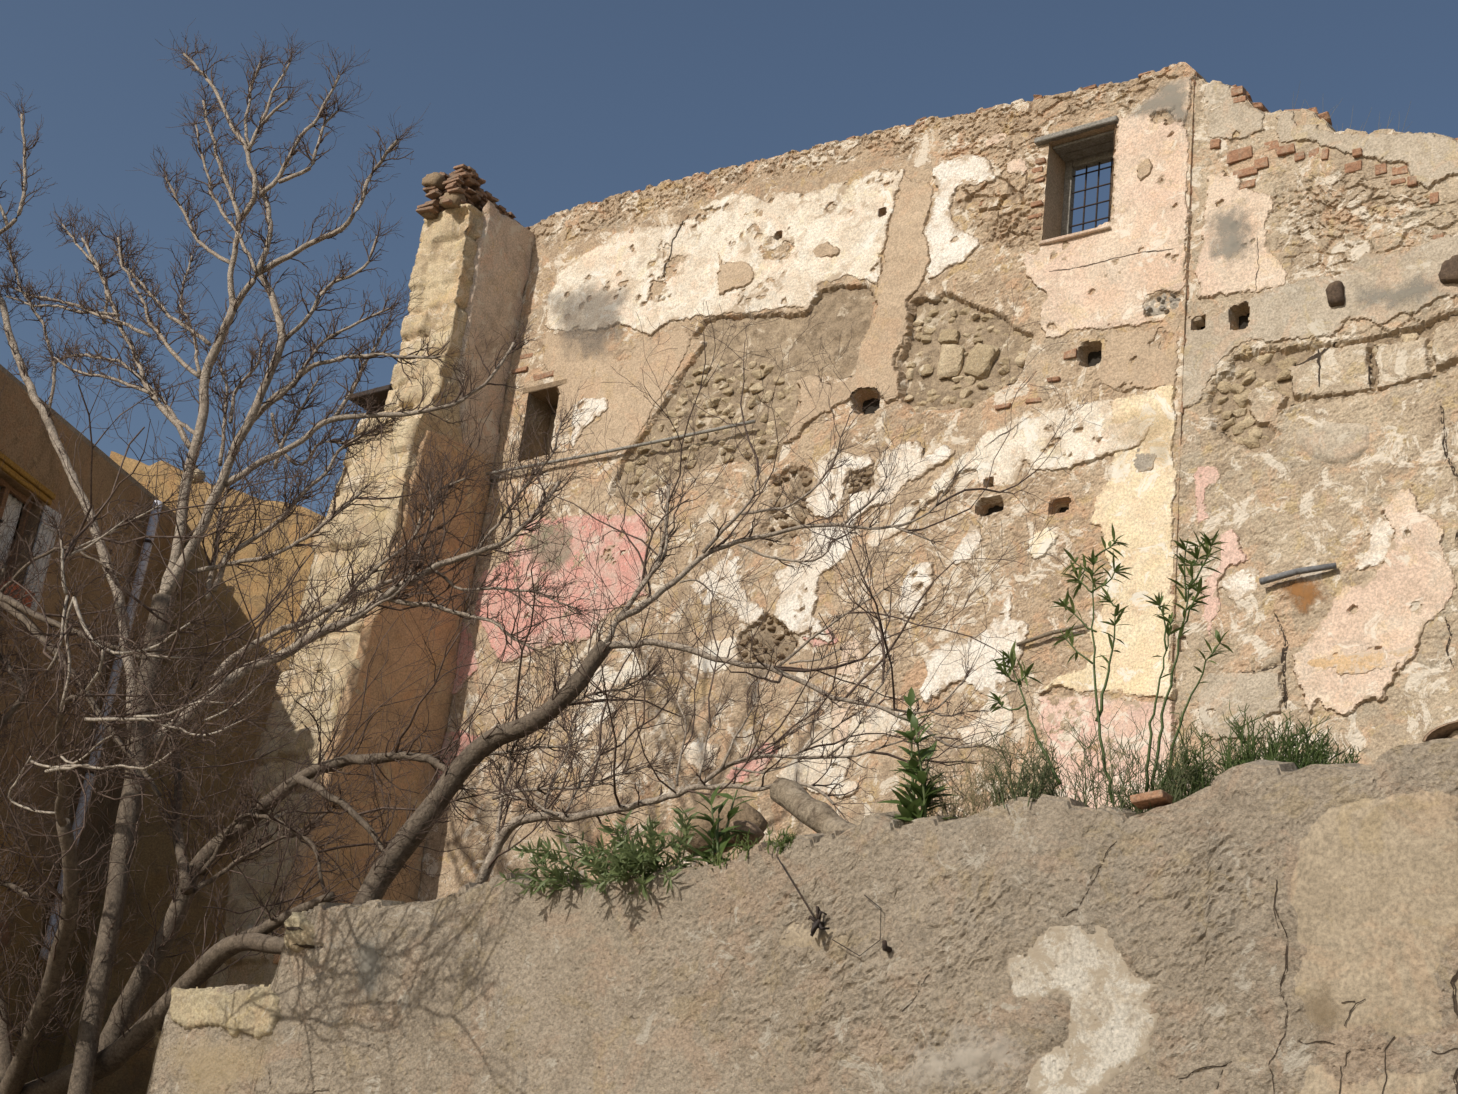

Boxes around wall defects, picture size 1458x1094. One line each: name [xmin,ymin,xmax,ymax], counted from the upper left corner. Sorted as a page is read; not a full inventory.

flaking render [544,76,1458,701]
crack [1440,406,1458,482]
flaking render [570,650,642,738]
flaking render [680,626,902,800]
flaking render [919,594,1030,749]
flaking render [1197,483,1457,742]
spalling [1007,925,1159,1094]
crack [1178,1061,1232,1089]
crack [1269,876,1395,1094]
crack [1432,971,1458,1094]